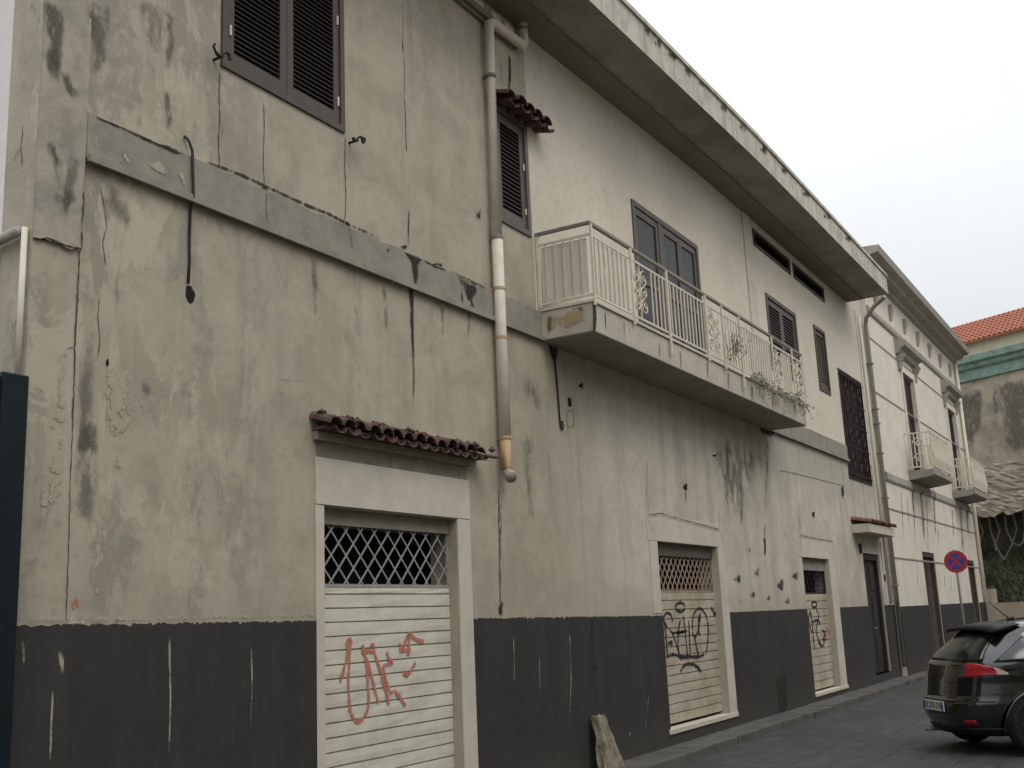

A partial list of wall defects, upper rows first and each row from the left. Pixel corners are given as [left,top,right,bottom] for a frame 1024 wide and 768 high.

crack [216,75,224,165]
crack [261,108,269,222]
leakage [388,217,445,398]
leakage [458,275,484,331]
leakage [962,383,1024,451]
leakage [718,428,774,520]